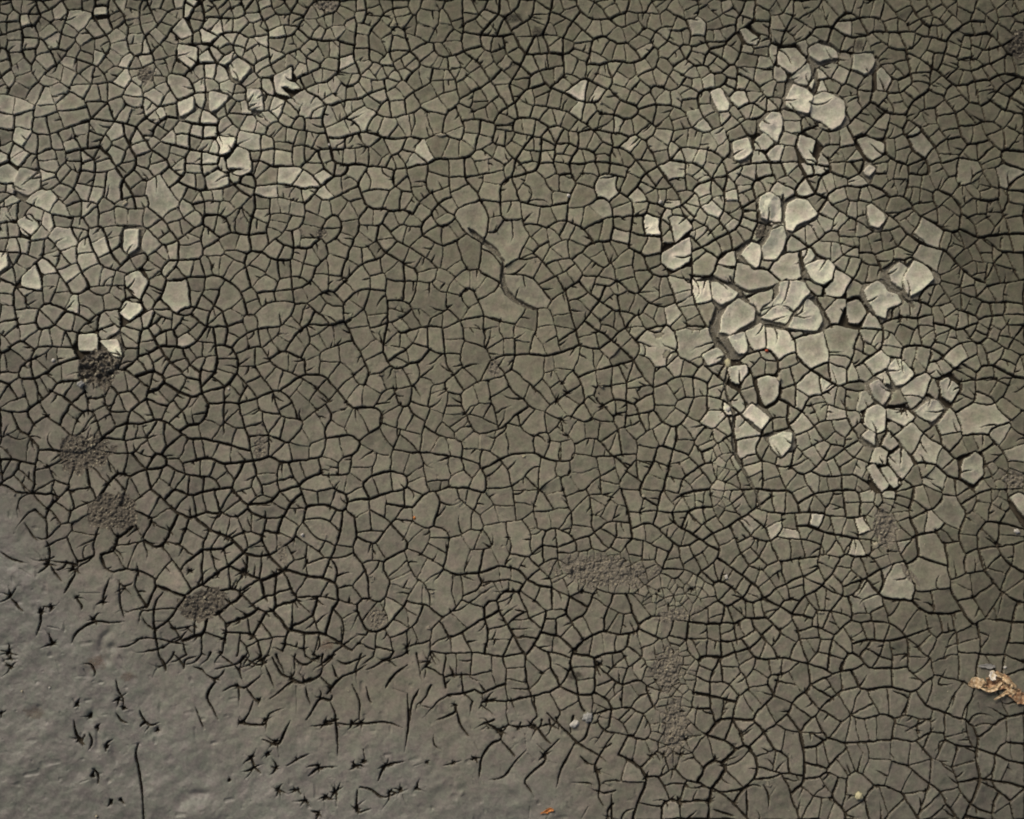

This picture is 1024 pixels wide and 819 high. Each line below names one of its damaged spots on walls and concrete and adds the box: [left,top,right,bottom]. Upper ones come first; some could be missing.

spalling [137,65,157,84]
crack [1,589,57,647]
crack [72,613,120,642]
crack [73,664,160,819]
crack [195,667,225,717]
crack [223,676,280,727]
crack [243,723,334,776]
crack [275,785,342,819]
crack [306,684,399,753]
crack [350,749,421,814]
crack [405,685,432,745]
crack [524,739,559,793]